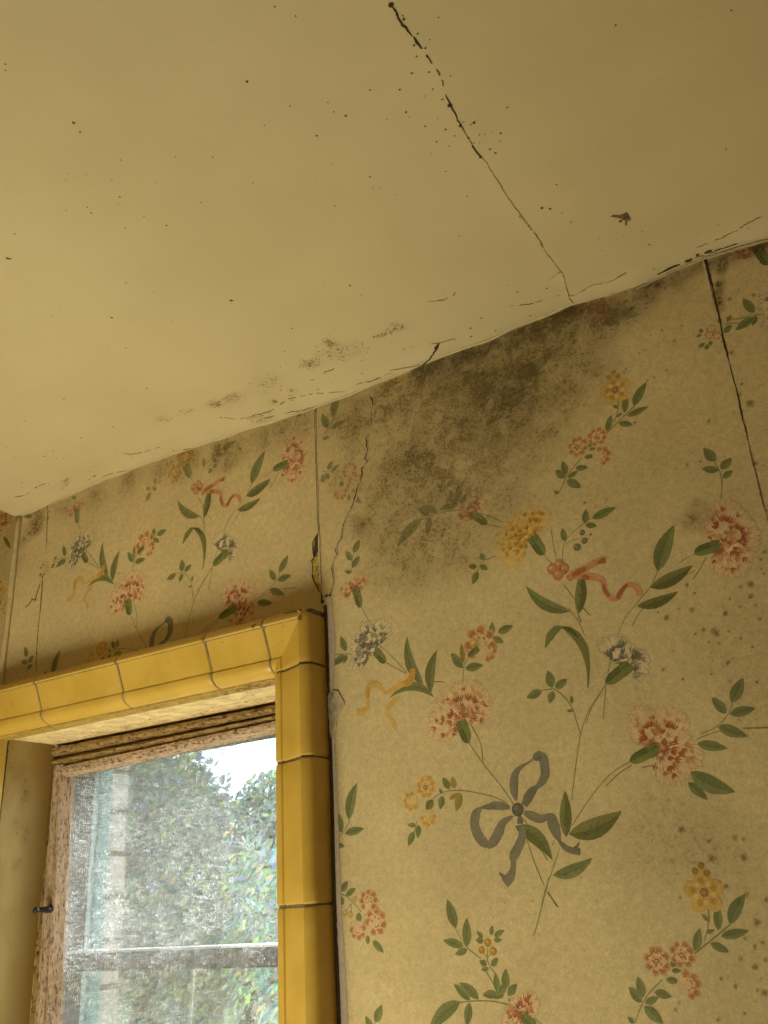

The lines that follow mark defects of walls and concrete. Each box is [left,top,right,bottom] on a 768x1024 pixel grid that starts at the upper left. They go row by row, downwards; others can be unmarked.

crack [388,3,768,307]
crack [219,338,457,603]
leakage [331,271,691,577]